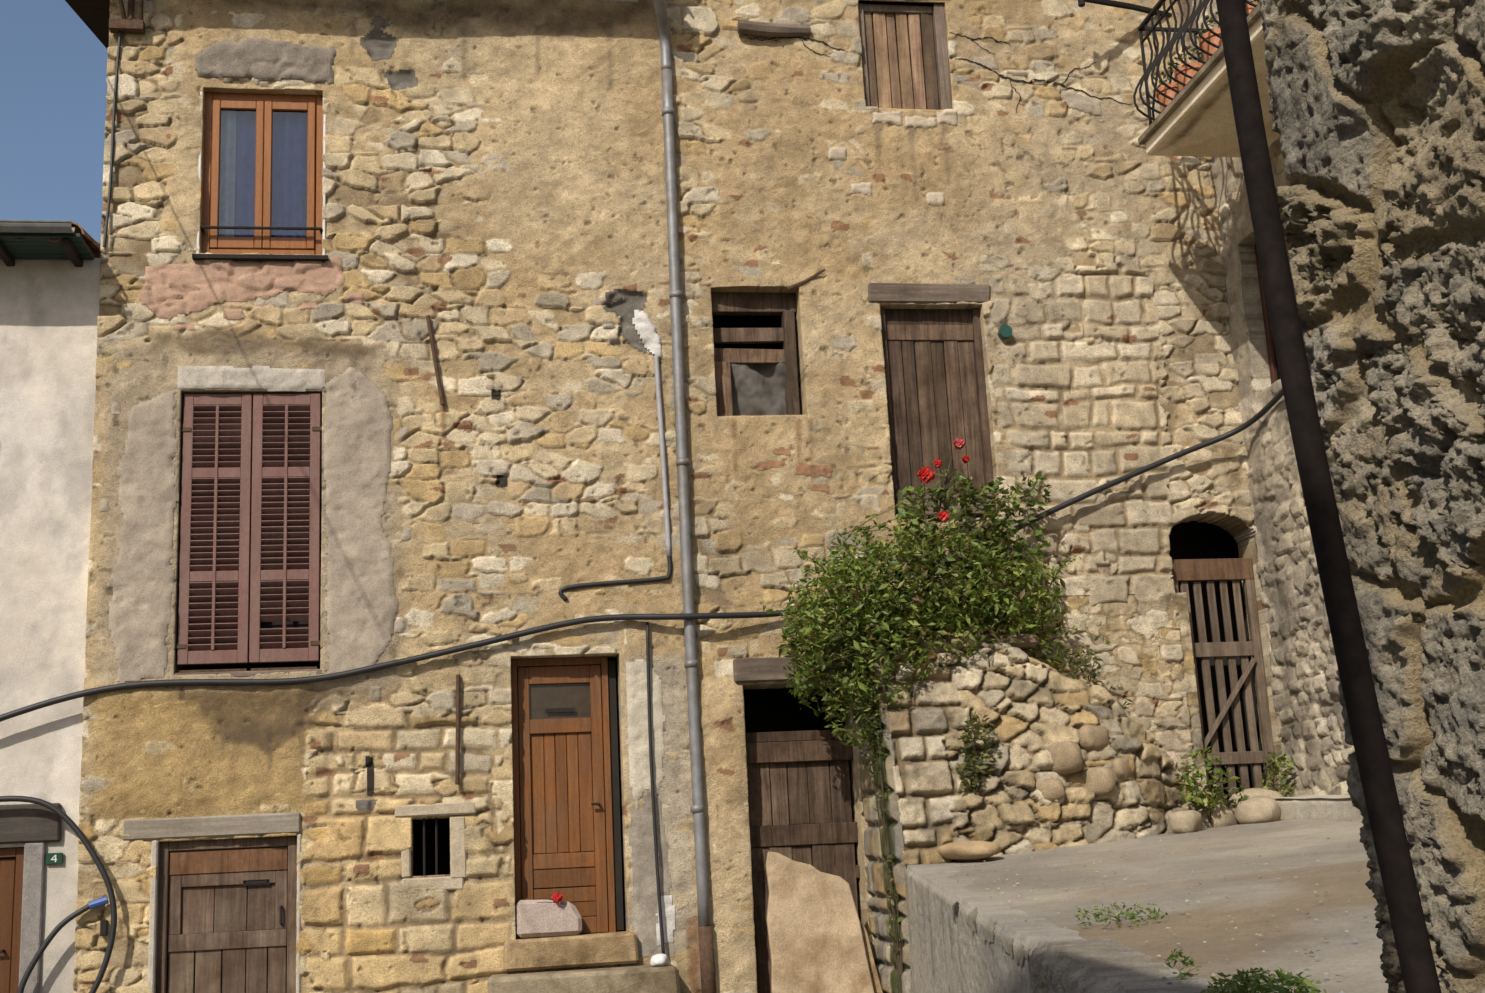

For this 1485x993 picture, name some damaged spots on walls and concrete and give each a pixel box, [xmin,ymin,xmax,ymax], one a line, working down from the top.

crack [950,32,1131,115]
leakage [182,690,341,750]